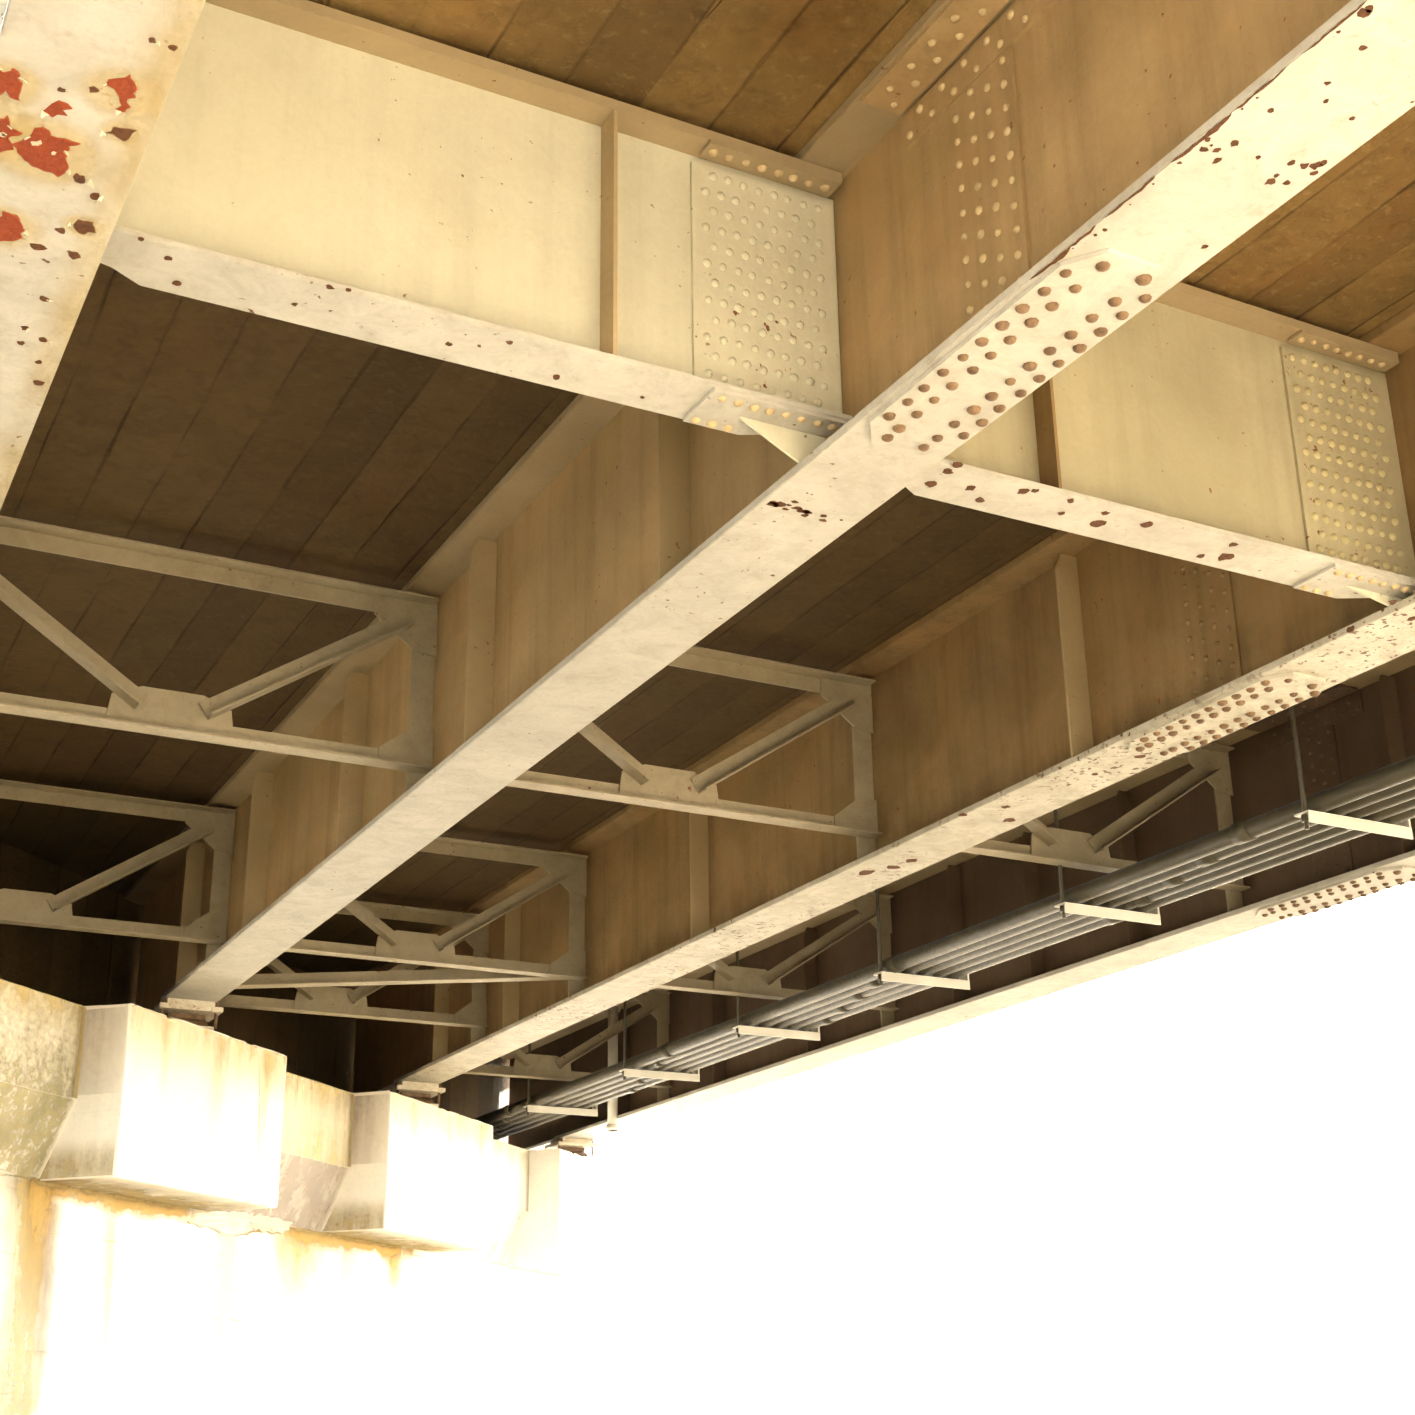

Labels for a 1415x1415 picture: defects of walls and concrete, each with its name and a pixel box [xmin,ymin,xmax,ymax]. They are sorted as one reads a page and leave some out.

rust [1302,0,1374,54]
peeling [0,68,81,177]
peeling [100,74,138,141]
rust [1171,68,1285,164]
rust [1265,160,1327,185]
peeling [0,211,28,242]
rust [1030,176,1155,280]
rust [766,500,843,522]
rust [859,859,917,875]
water stain [0,979,29,997]
water stain [0,1005,449,1415]